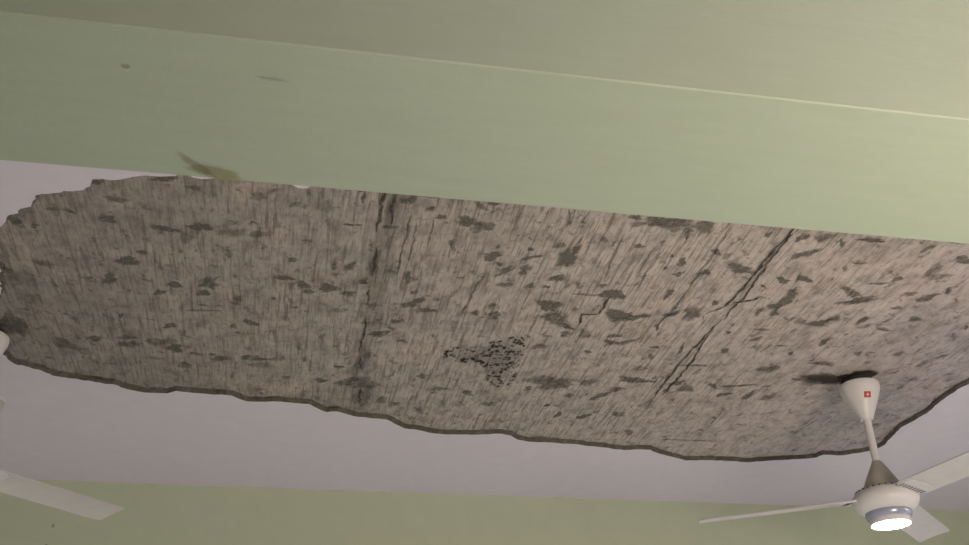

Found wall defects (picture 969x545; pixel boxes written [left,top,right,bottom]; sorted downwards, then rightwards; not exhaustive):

crack [358,193,396,403]
spalling [0,174,969,462]
crack [649,229,799,403]